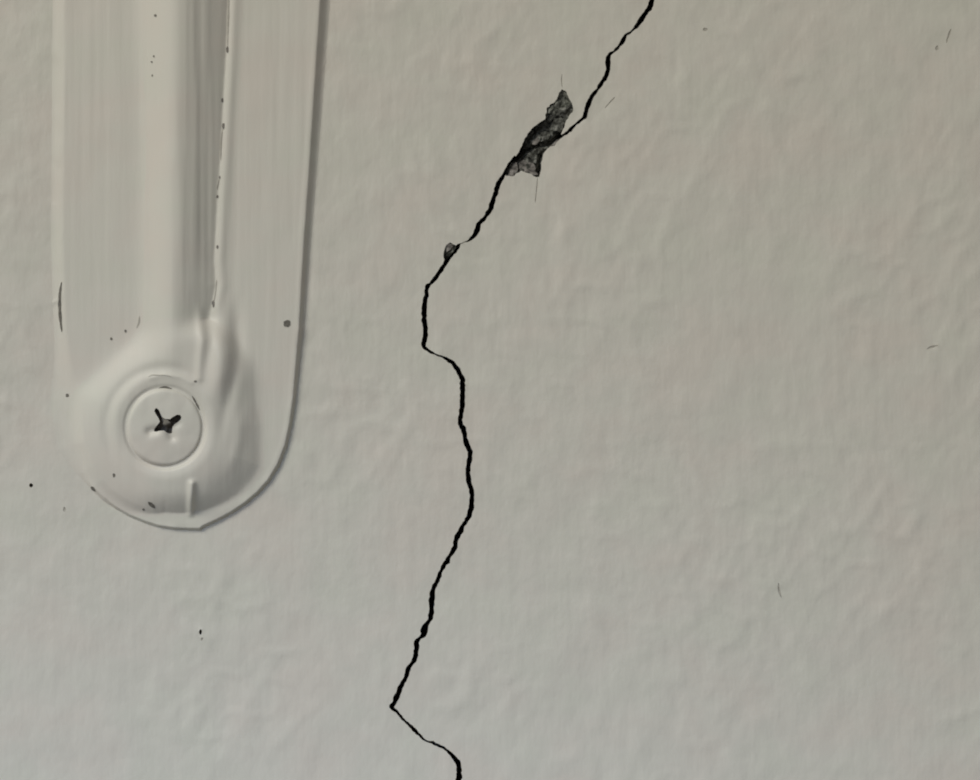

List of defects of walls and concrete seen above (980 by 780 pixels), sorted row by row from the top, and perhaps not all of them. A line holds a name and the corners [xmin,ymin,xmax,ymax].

spalling [505,90,573,177]
crack [561,0,654,138]
crack [389,156,516,780]